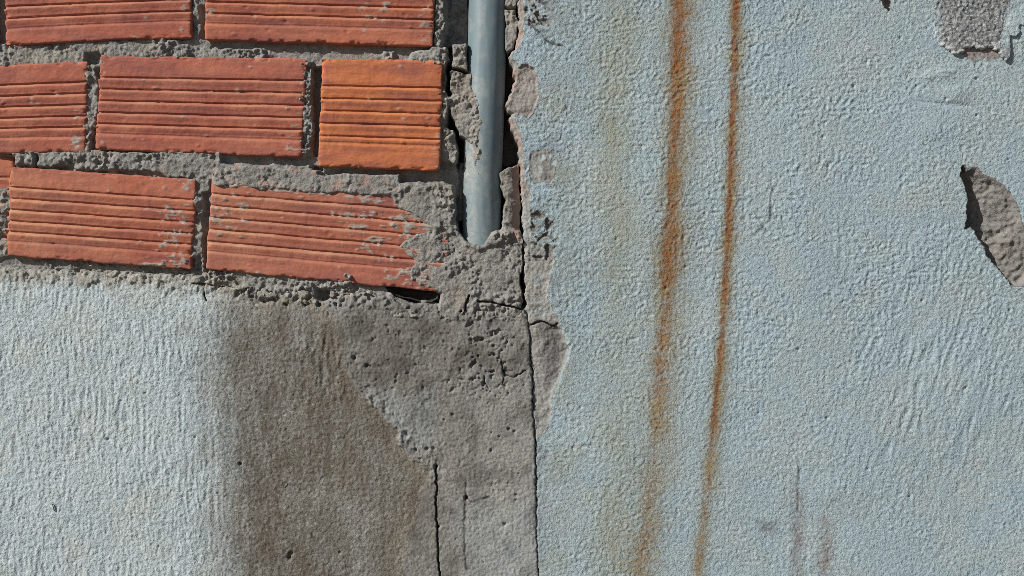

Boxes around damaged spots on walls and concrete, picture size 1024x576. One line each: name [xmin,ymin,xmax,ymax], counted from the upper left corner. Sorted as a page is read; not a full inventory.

peeling [933,0,1024,62]
damp [227,310,429,576]
crack [434,466,442,576]
crack [463,297,558,326]
spalling [504,0,568,436]
rust [649,0,692,439]
rust [706,0,743,489]
spalling [959,165,1024,286]